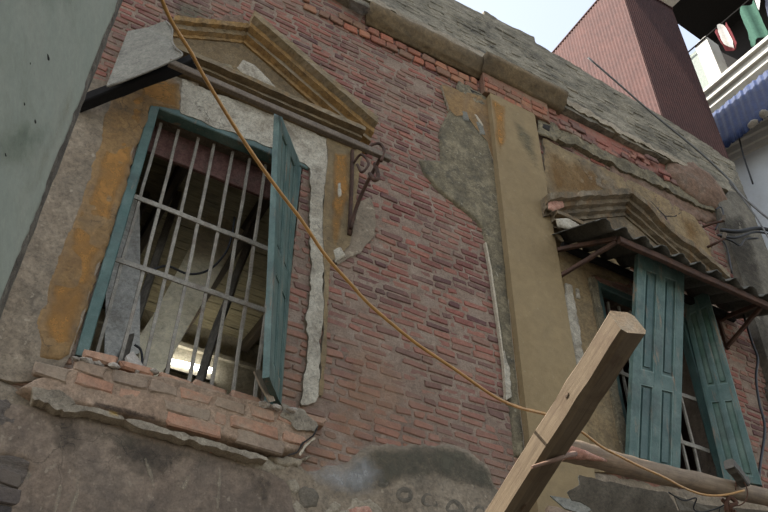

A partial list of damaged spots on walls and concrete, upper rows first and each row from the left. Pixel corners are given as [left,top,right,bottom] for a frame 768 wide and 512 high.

rust [143,80,175,105]
spalling [547,201,579,229]
flaking render [333,247,346,262]
peeling [483,242,512,400]
water stain [332,449,491,488]